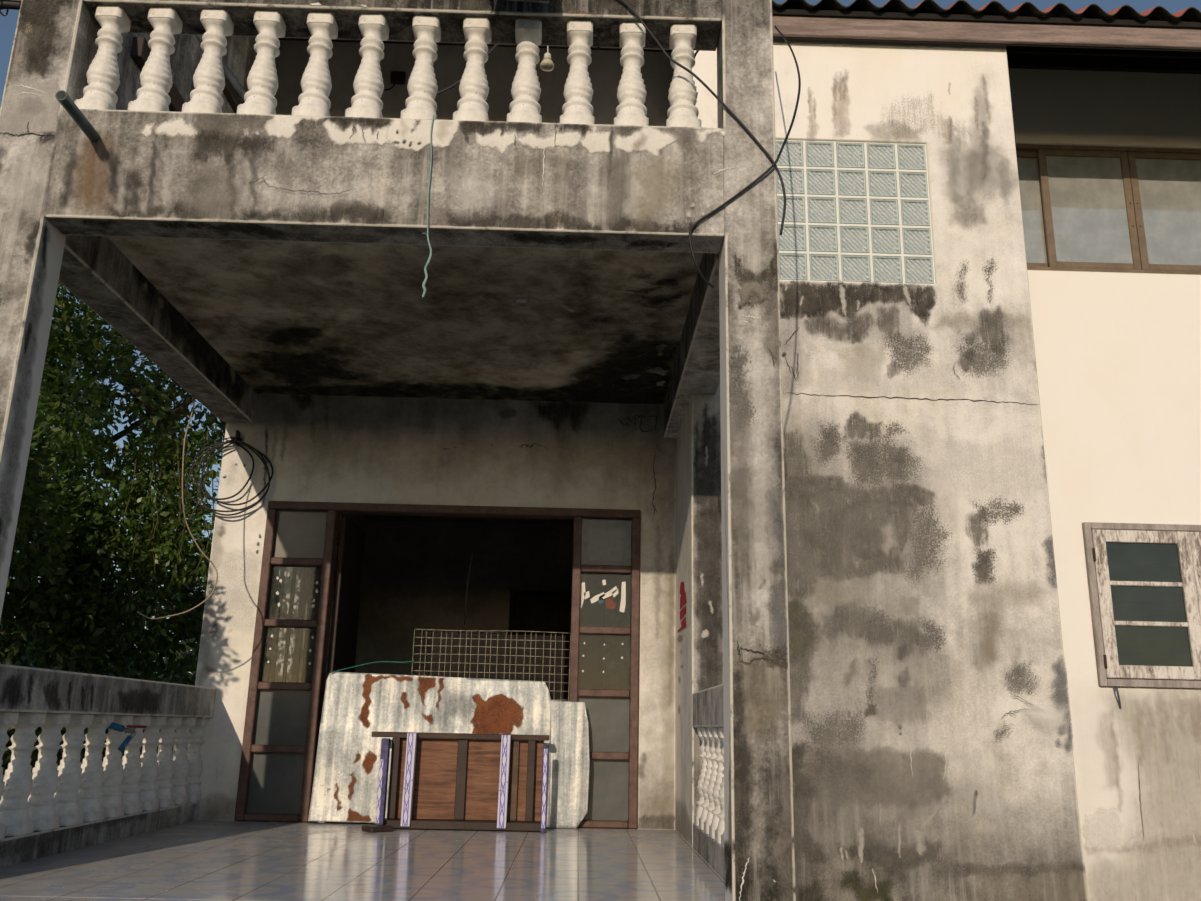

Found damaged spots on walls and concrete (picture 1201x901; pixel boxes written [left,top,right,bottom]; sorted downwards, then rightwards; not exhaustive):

peeling [141,117,201,138]
damp [82,113,390,239]
peeling [243,115,459,151]
damp [133,266,685,431]
damp [728,243,935,381]
crack [787,355,1039,405]
damp [955,259,1012,379]
damp [694,343,758,897]
damp [764,413,952,669]
damp [970,498,1025,584]
damp [1045,536,1057,587]
damp [774,604,1086,877]